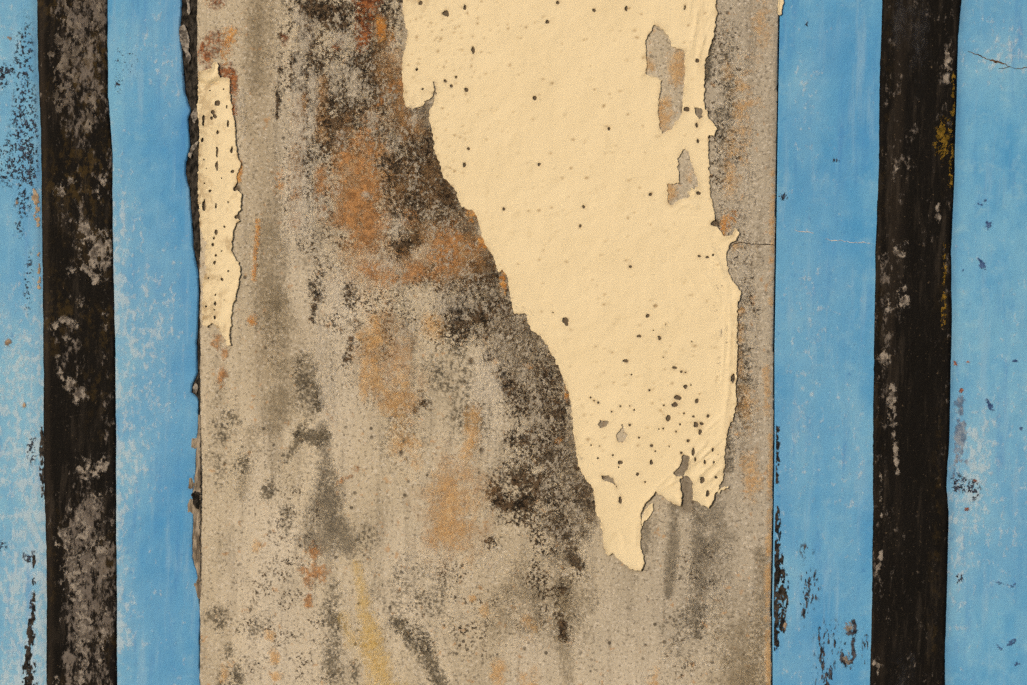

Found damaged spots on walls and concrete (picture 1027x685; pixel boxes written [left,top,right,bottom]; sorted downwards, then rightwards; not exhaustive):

crack [968,51,1027,69]
peeling [32,189,40,227]
peeling [179,0,242,346]
corrosion [315,80,417,252]
leakage [236,0,595,685]
peeling [401,0,741,571]
leakage [212,410,248,485]
corrosion [300,547,327,607]
peeling [774,506,819,651]
peeling [818,619,880,685]